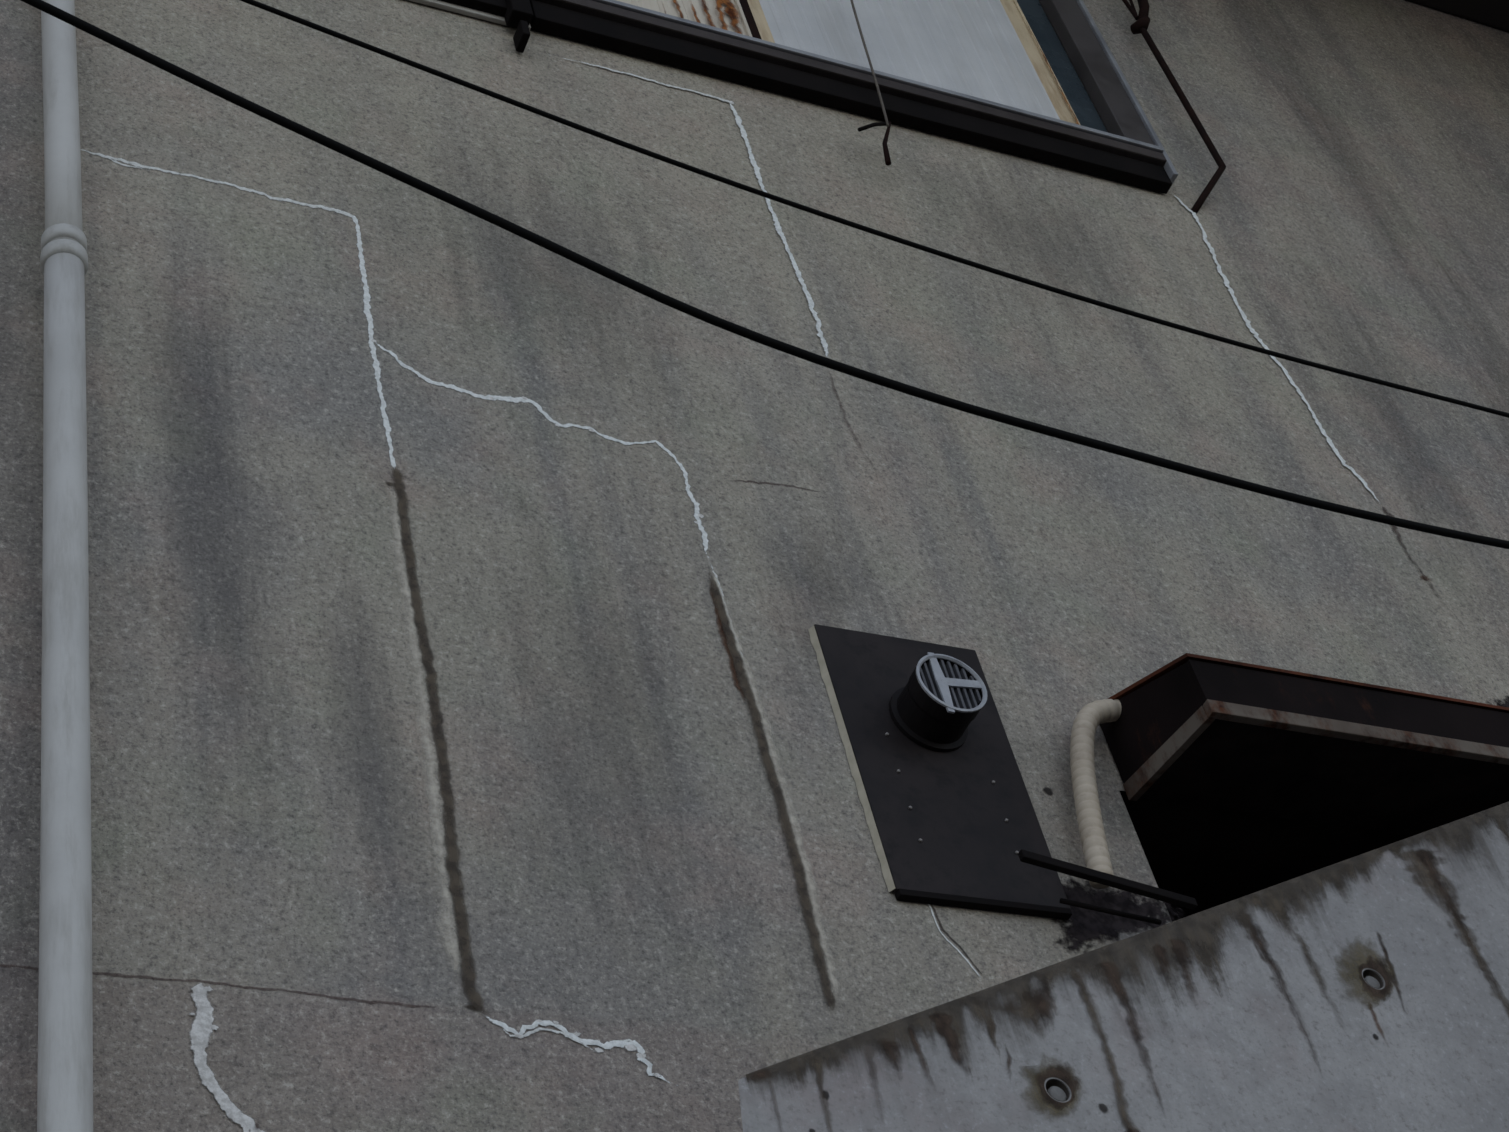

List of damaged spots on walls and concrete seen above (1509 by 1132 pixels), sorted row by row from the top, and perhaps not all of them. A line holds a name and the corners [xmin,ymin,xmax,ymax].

crack [564,58,853,433]
crack [80,149,743,656]
crack [738,480,813,491]
crack [1169,190,1434,590]
crack [92,972,429,1007]
crack [487,1016,678,1086]
leakage [746,850,1376,1132]
leakage [1338,934,1401,1034]
leakage [1392,802,1509,1014]